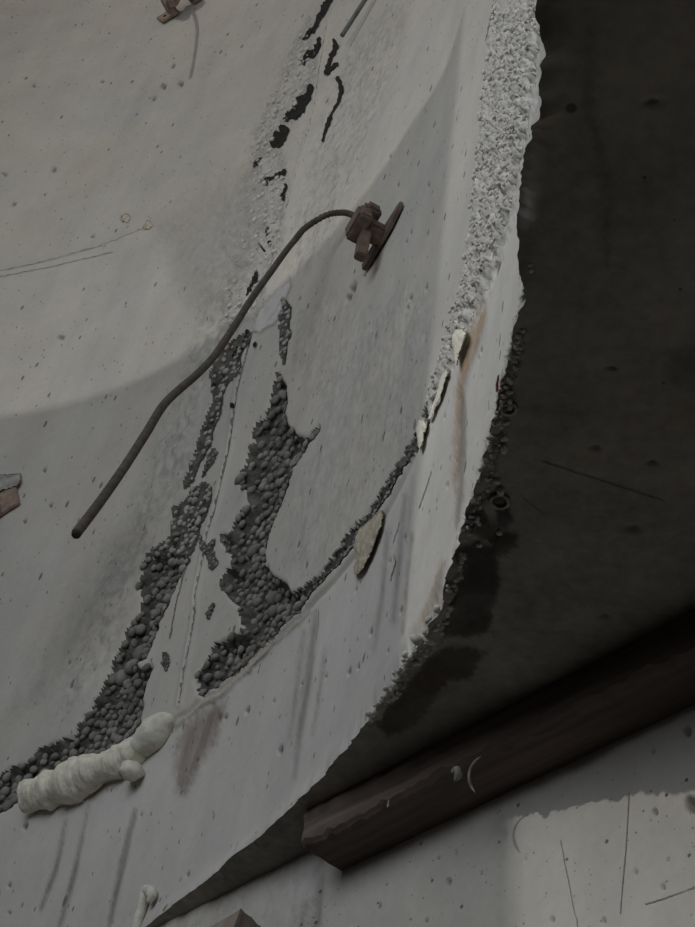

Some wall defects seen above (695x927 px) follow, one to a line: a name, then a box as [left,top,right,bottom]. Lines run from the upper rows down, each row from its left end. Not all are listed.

crack [253,0,332,207]
crack [246,226,273,304]
spalling [421,0,540,424]
spalling [0,27,419,812]
crack [169,329,256,703]
spalling [365,551,467,728]
leakage [377,648,480,735]
leakage [443,509,517,637]
spalling [461,328,525,548]